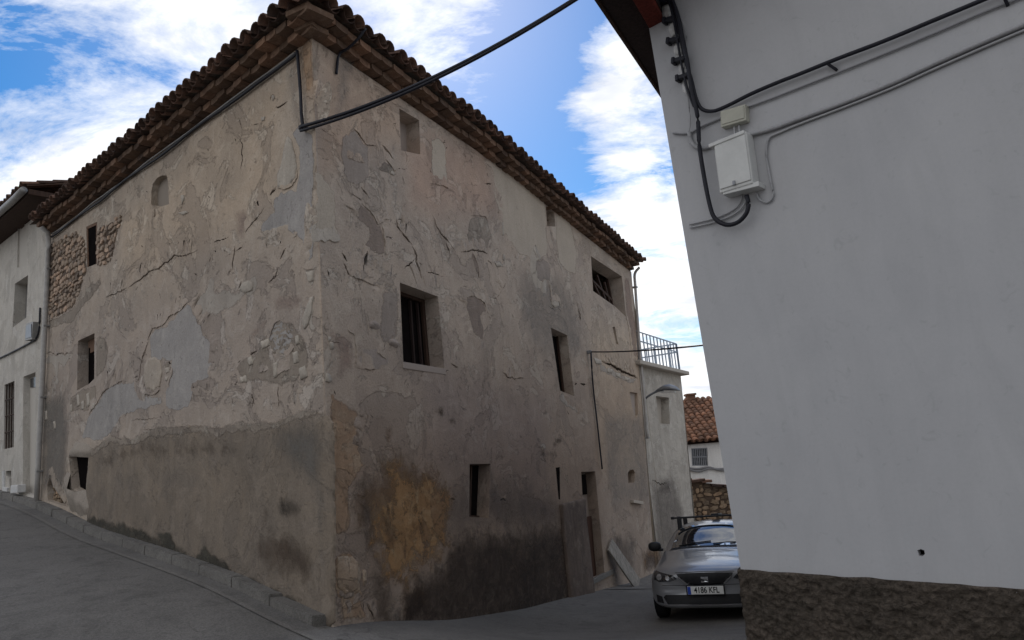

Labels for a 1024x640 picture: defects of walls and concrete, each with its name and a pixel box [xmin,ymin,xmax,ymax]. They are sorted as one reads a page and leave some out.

spalling [48,215,122,328]
flaking render [259,128,315,266]
crack [396,215,444,291]
flaking render [458,159,577,351]
flaking render [70,289,324,456]
crack [601,353,637,378]
damp [87,516,228,570]
damp [378,531,569,621]